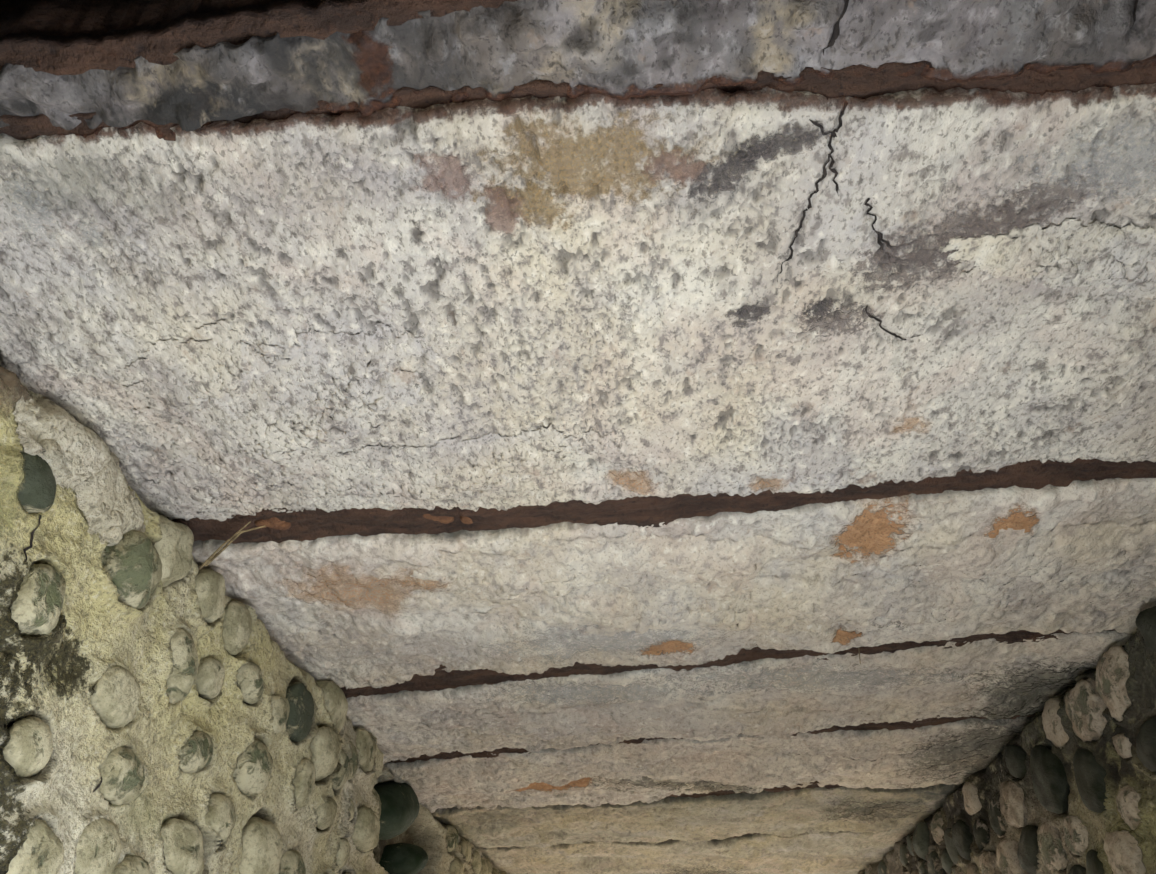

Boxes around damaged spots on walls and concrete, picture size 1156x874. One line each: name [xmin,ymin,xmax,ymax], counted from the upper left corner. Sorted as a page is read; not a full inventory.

crack [777,102,916,280]
corrosion [832,498,911,563]
corrosion [984,506,1040,538]
corrosion [641,640,694,657]
corrosion [832,628,862,645]